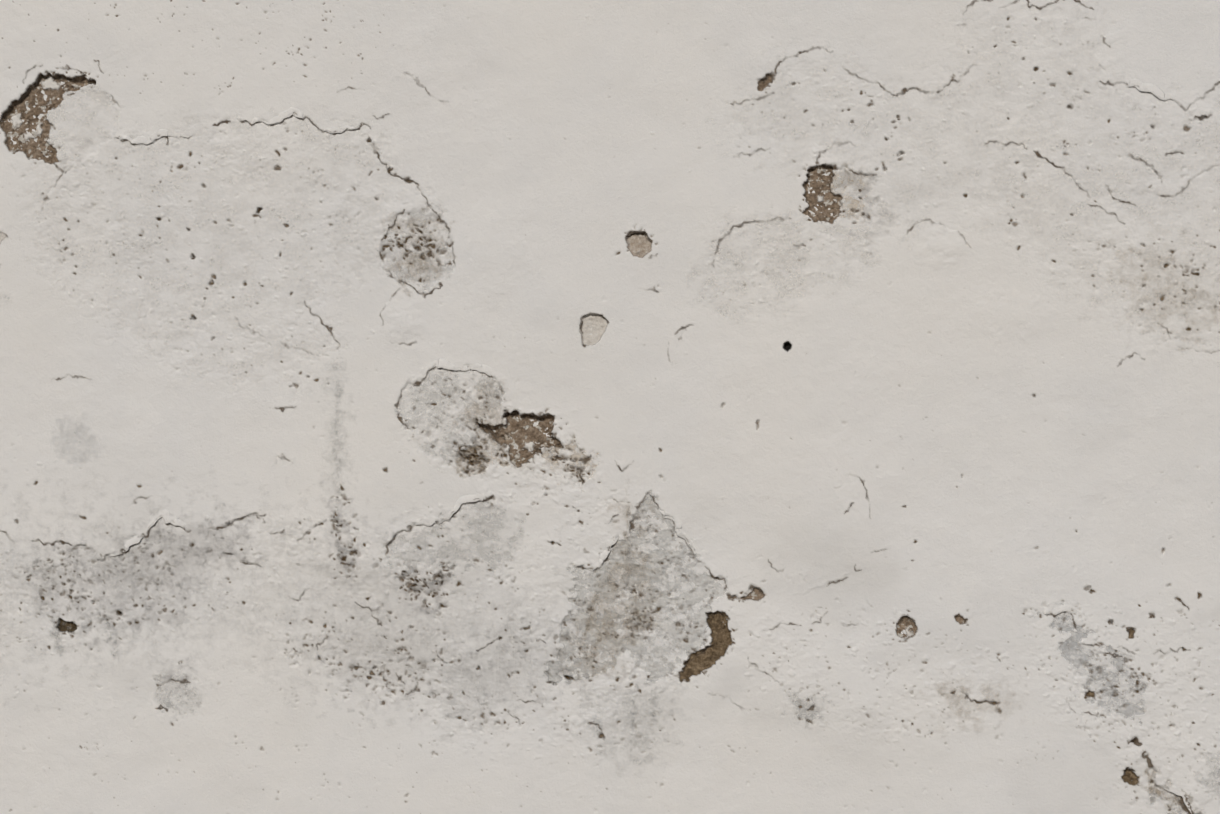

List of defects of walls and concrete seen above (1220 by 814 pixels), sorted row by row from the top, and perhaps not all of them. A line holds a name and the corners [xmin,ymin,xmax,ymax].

spalling [0,73,96,163]
crack [1100,79,1207,120]
crack [115,107,437,214]
crack [986,141,1061,168]
spalling [802,165,876,224]
spalling [626,232,652,258]
spalling [580,313,609,347]
spalling [476,410,595,467]
crack [97,509,283,564]
peeling [544,490,765,683]
spalling [896,616,917,638]
crack [1128,737,1195,814]